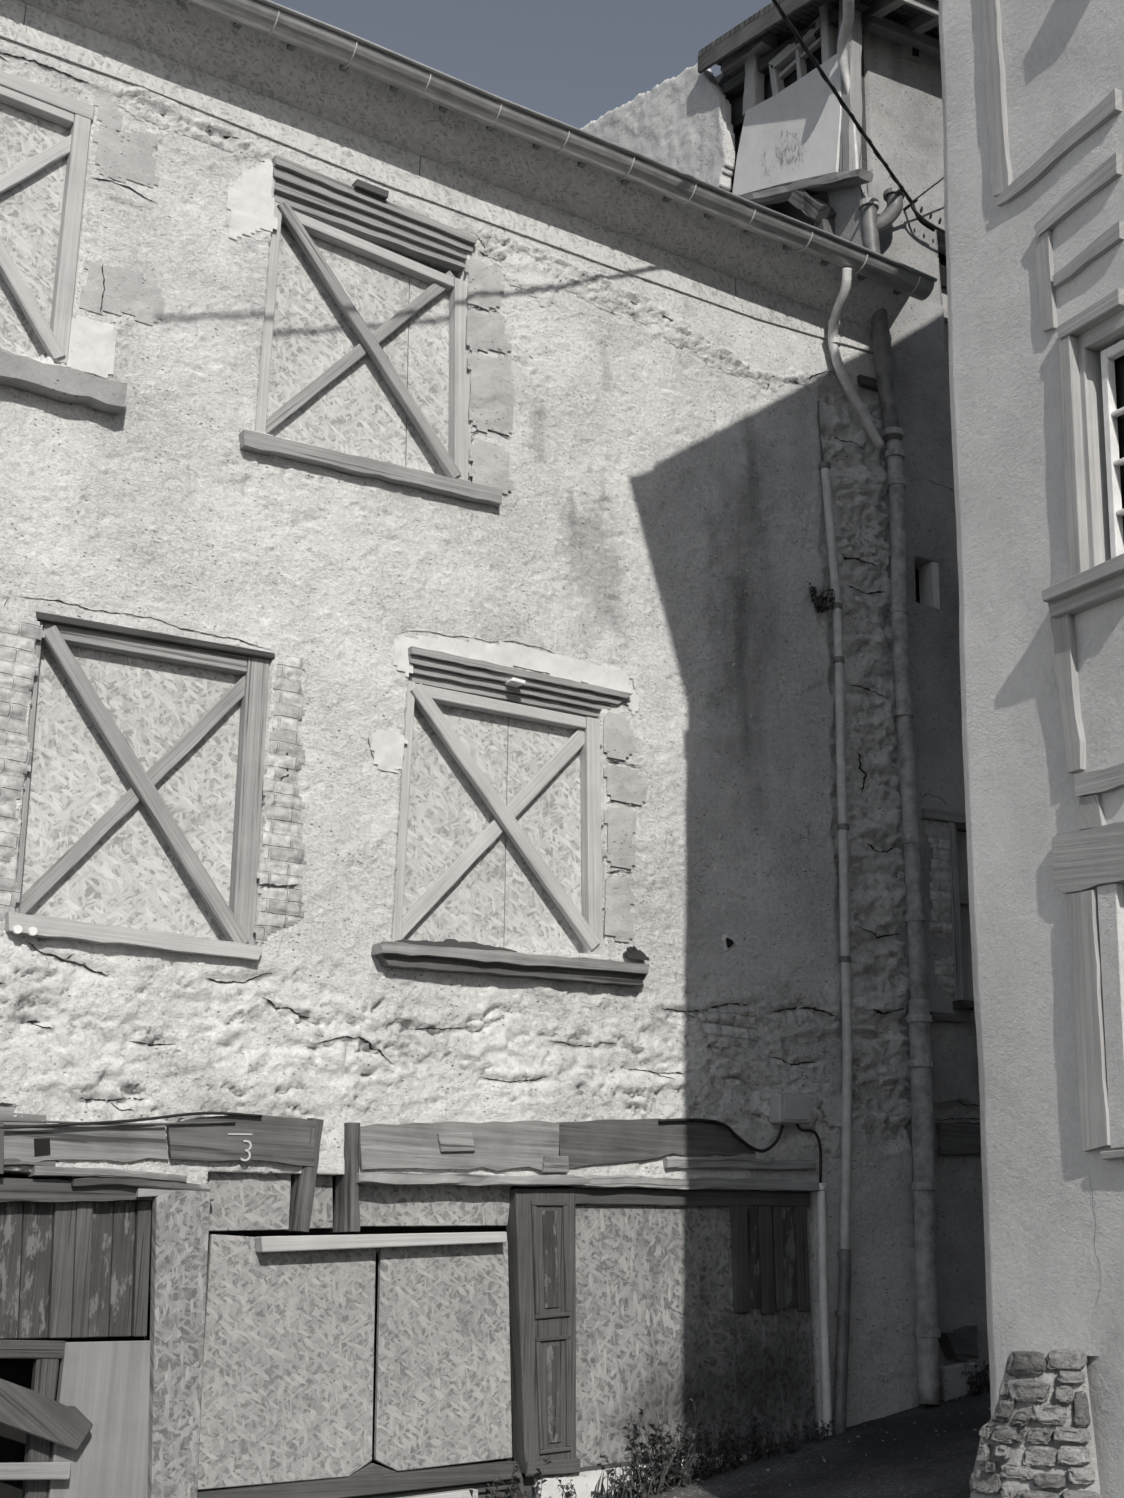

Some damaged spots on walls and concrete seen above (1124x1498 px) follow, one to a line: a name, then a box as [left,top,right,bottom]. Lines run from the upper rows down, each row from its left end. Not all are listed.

flaking render [79,259,165,326]
flaking render [0,618,45,920]
flaking render [253,656,307,946]
crack [27,942,106,976]
crack [22,1020,53,1029]
crack [130,1039,172,1047]
crack [206,973,394,1065]
crack [411,1024,466,1032]
crack [551,1041,684,1079]
crack [661,1003,904,1018]
crack [481,1076,544,1084]
crack [79,1098,147,1111]